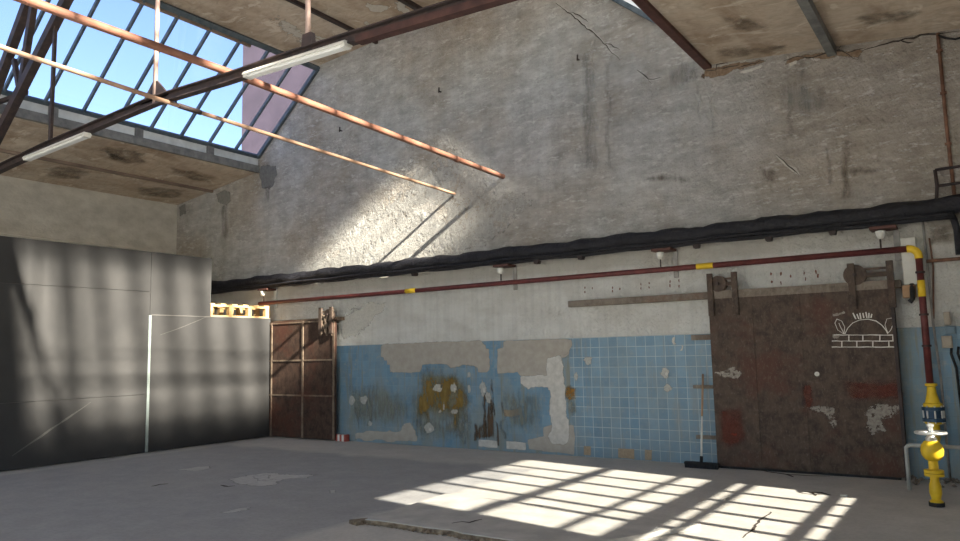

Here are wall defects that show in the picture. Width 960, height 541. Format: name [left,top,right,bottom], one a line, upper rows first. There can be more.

crack [556,2,661,84]
crack [784,31,957,61]
flaking render [701,60,764,79]
peeling [381,339,572,403]
corrosion [417,375,466,428]
corrosion [565,387,575,413]
flaking render [355,421,434,442]
peeling [478,425,591,455]